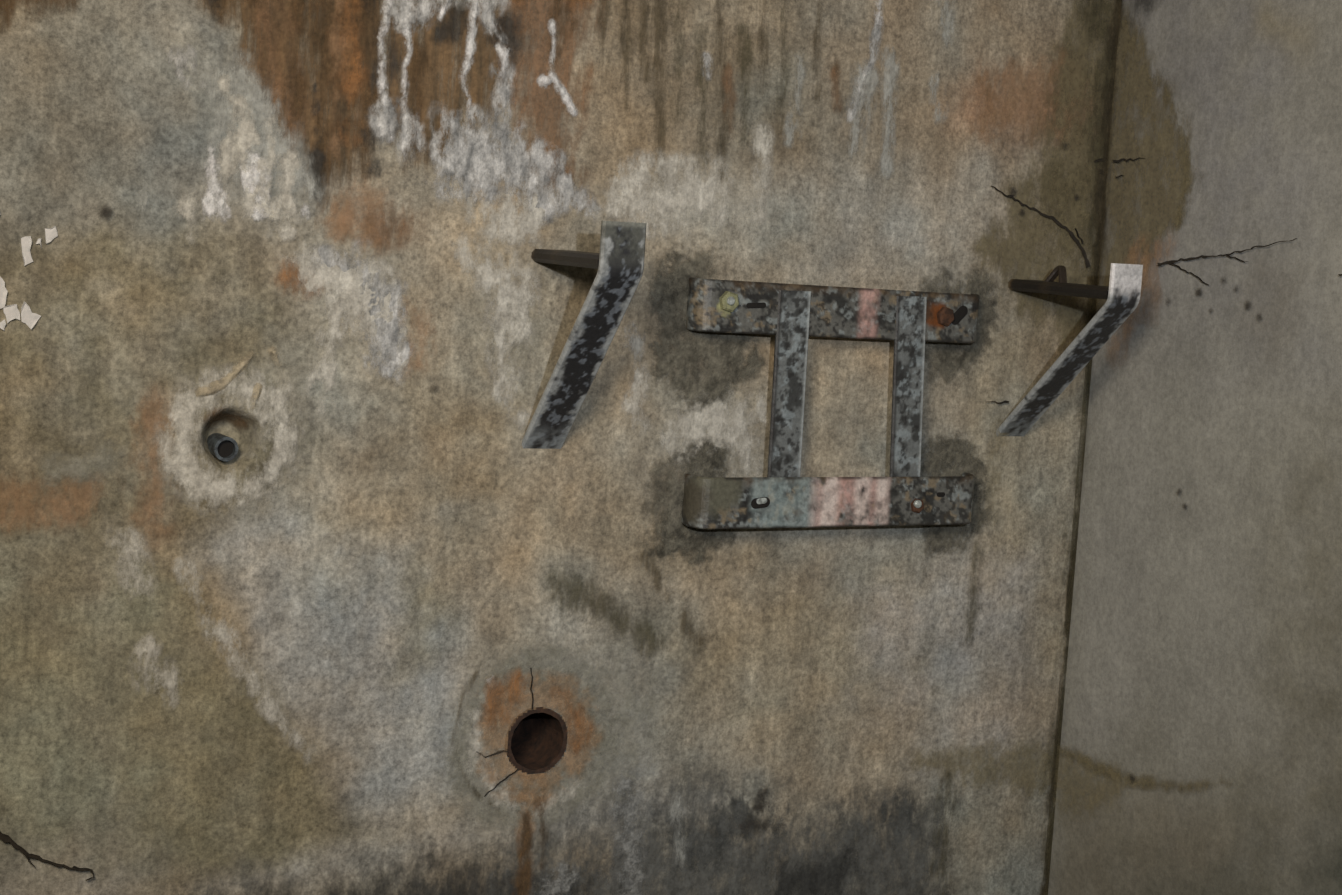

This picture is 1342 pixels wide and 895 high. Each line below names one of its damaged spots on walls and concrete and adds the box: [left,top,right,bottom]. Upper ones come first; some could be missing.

damp [370,0,732,244]
damp [753,121,792,222]
crack [991,0,1140,314]
crack [1157,238,1297,285]
damp [455,237,533,424]
damp [624,336,648,422]
damp [663,389,767,469]
crack [1040,359,1092,895]
crack [0,831,95,881]
damp [407,775,942,895]